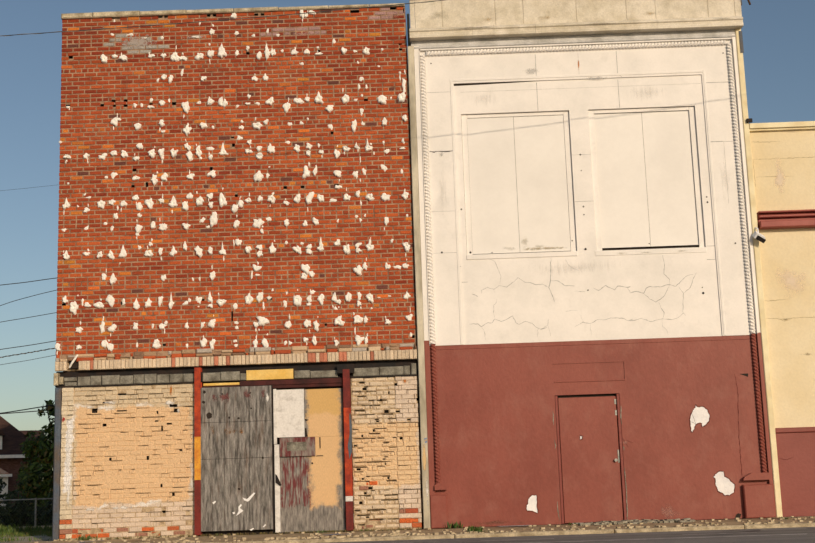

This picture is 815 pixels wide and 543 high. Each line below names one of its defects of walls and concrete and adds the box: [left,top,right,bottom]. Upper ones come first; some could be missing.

crack [473,259,696,340]
peeling [689,405,710,433]
peeling [713,470,735,496]
peeling [526,494,538,514]